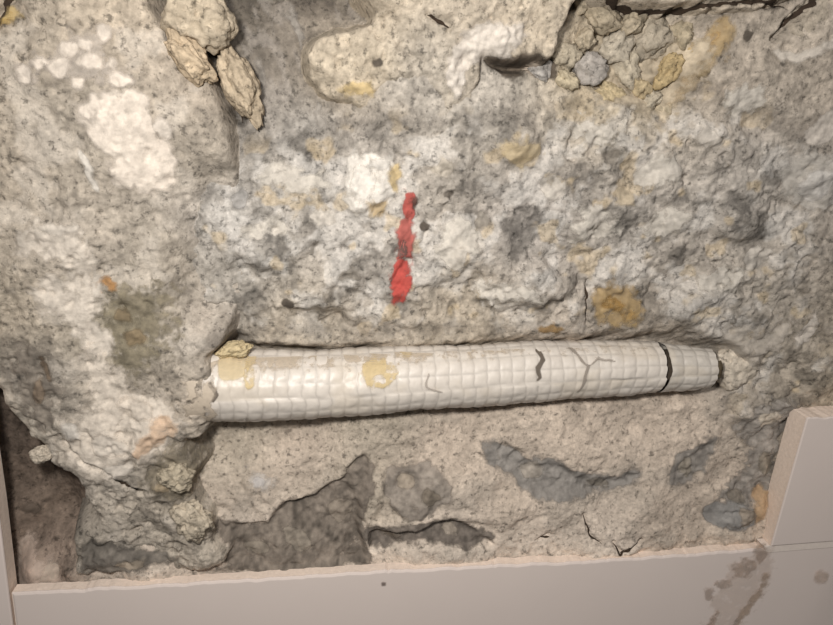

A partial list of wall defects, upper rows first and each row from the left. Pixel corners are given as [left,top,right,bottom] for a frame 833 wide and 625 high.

crack [605,0,817,38]
spalling [193,0,833,531]
spalling [100,279,182,375]
spalling [11,341,65,432]
spalling [4,409,178,578]
spalling [141,437,213,501]
spalling [209,455,495,572]